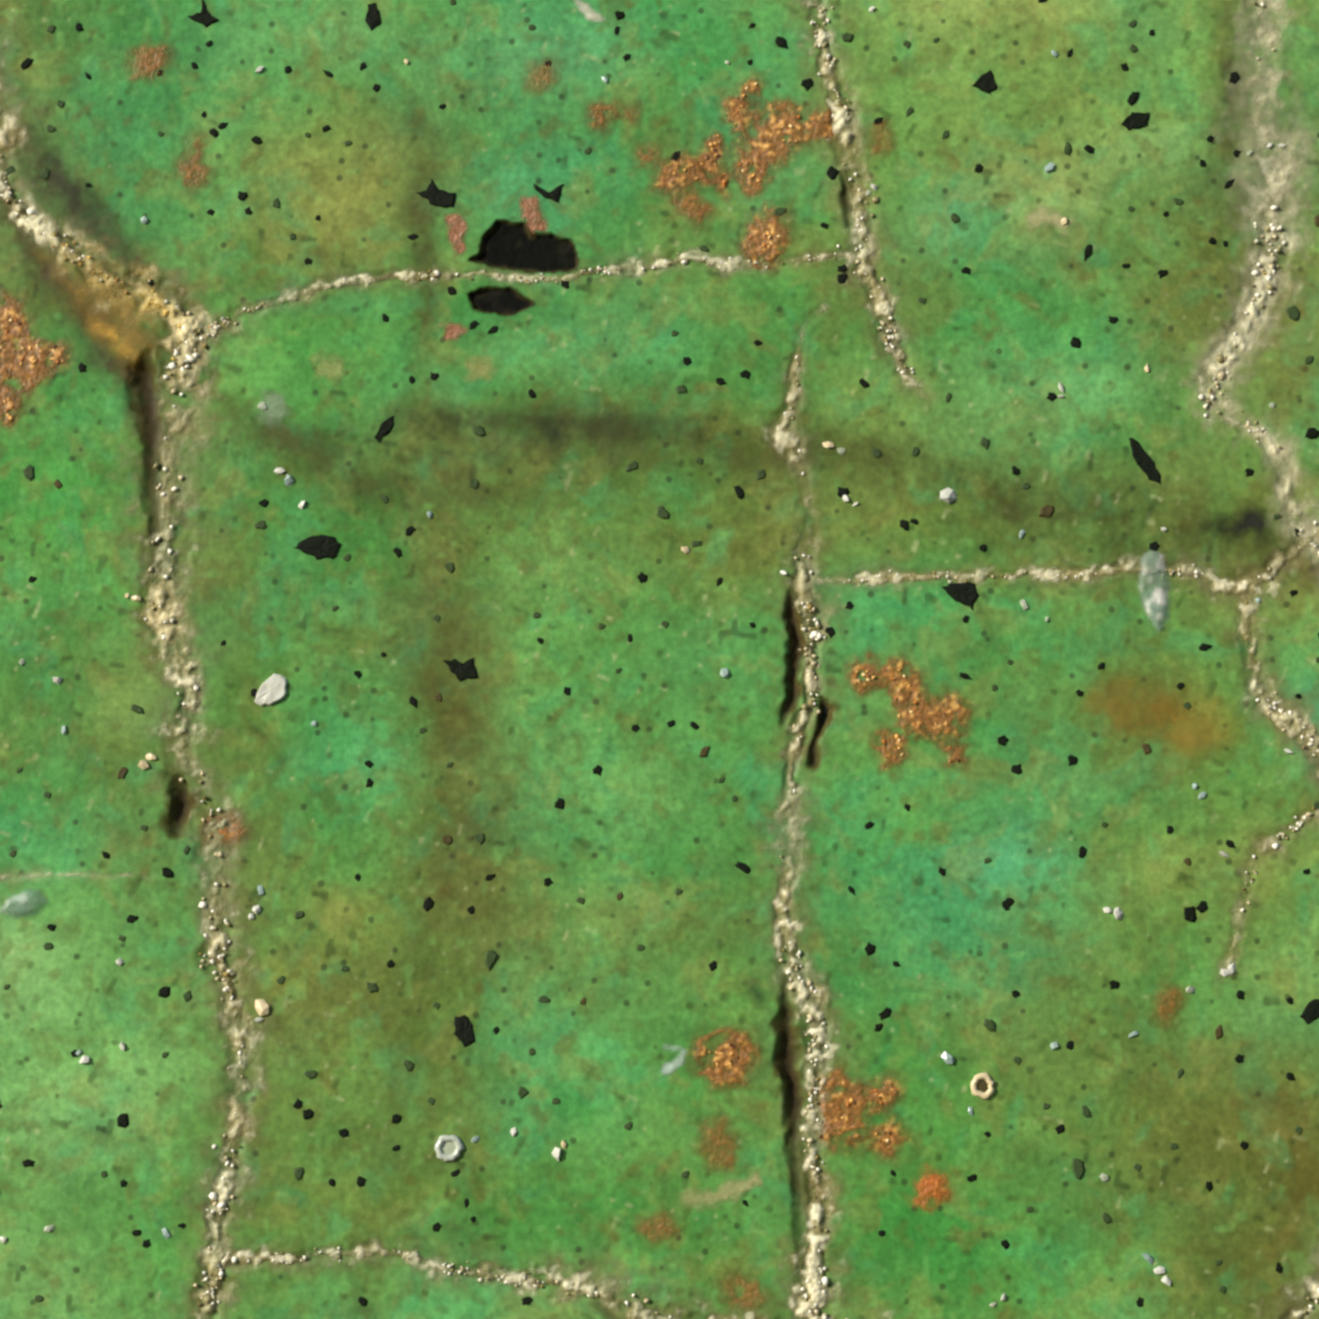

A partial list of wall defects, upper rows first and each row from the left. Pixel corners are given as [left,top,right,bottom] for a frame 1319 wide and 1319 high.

corrosion [639,79,835,221]
corrosion [743,208,789,268]
corrosion [0,293,67,426]
crack [0,0,918,1319]
corrosion [849,653,970,768]
crack [773,0,1319,1319]
corrosion [695,1028,758,1087]
corrosion [820,1068,904,1157]
corrosion [914,1173,947,1206]